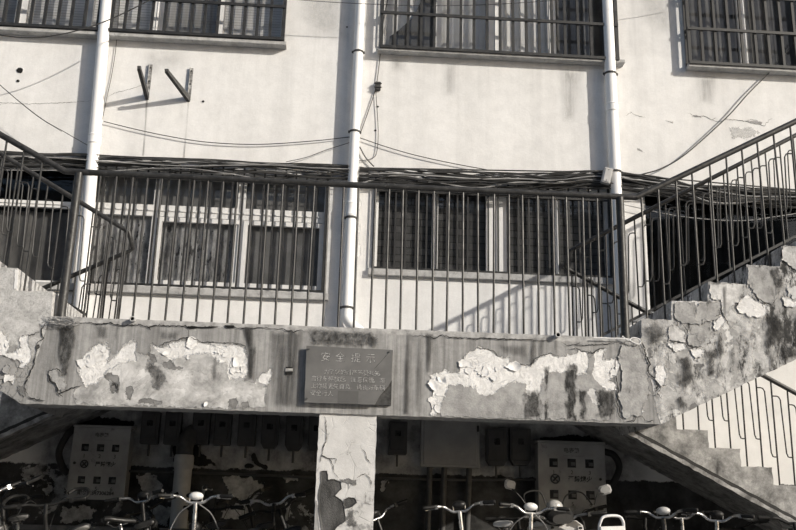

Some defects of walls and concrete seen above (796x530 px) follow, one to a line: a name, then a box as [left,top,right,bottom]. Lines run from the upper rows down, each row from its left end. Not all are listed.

peeling [668,247,796,358]
peeling [0,330,40,396]
damp [59,326,74,375]
peeling [48,326,273,409]
damp [525,392,547,419]
peeling [427,344,668,421]
damp [565,365,615,421]
damp [677,357,694,387]
damp [706,333,734,377]
mould [766,316,796,367]
crack [320,416,338,480]
spalling [314,471,357,530]